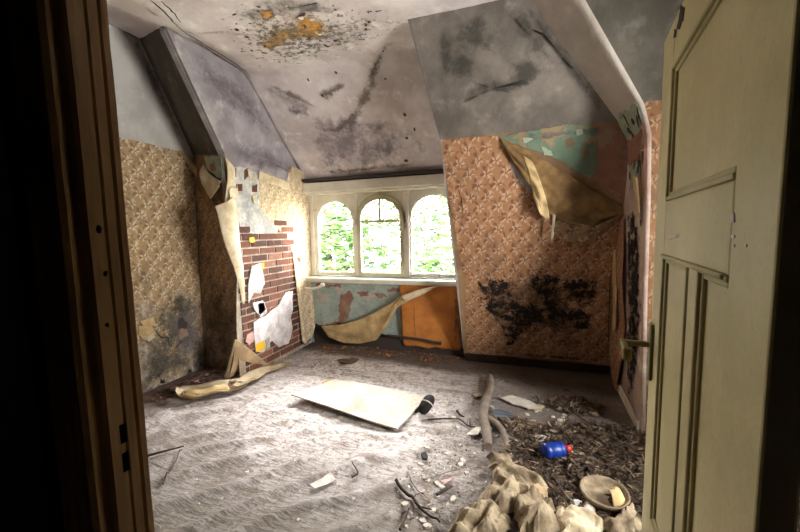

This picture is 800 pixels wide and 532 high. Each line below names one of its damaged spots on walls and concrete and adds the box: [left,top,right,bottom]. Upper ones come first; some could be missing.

water stain [319,56,394,172]
peeling [500,104,644,227]
water stain [149,296,195,384]
flaking render [229,166,311,377]
peeling [316,283,400,325]
water stain [477,269,597,359]
mould [626,212,641,395]